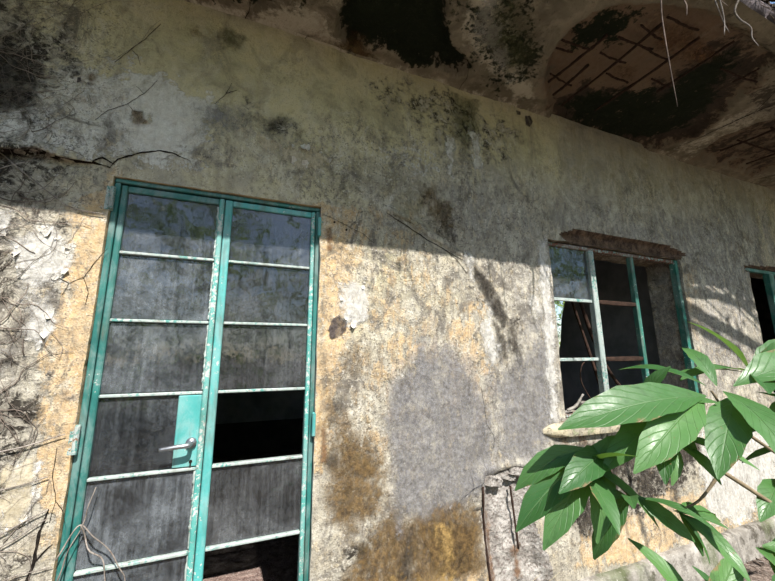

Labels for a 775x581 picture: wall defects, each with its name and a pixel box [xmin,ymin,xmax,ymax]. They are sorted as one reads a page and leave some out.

water stain [0,40,38,122]
spalling [335,0,473,77]
crack [0,129,190,168]
water stain [446,94,482,175]
water stain [465,243,557,456]
crack [25,448,65,581]
water stain [327,435,383,531]
water stain [347,346,495,581]
spalling [481,467,553,581]